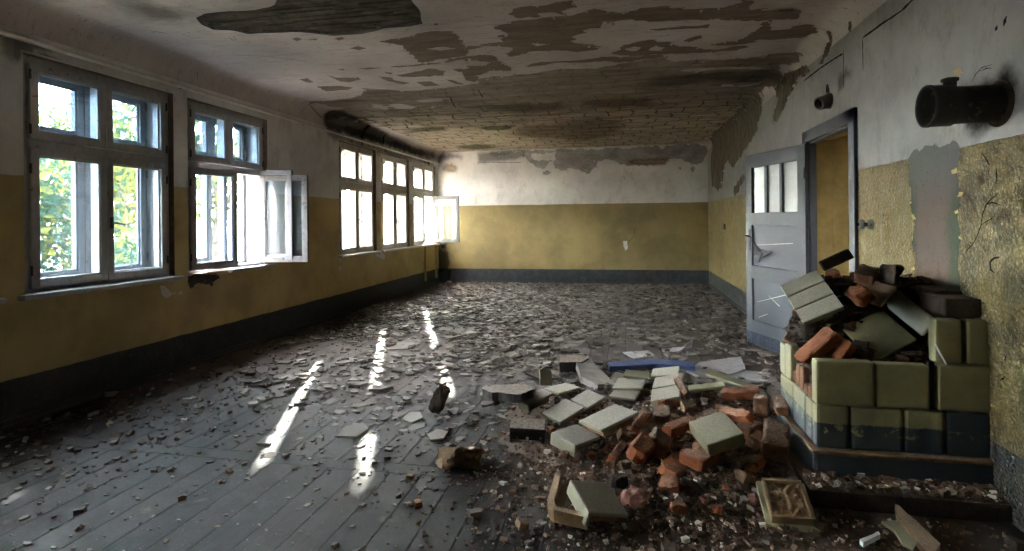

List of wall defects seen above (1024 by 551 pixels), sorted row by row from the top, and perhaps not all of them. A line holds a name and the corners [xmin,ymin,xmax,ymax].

peeling [196,0,832,196]
spalling [160,272,221,299]
peeling [908,141,963,291]
crack [964,154,1000,273]